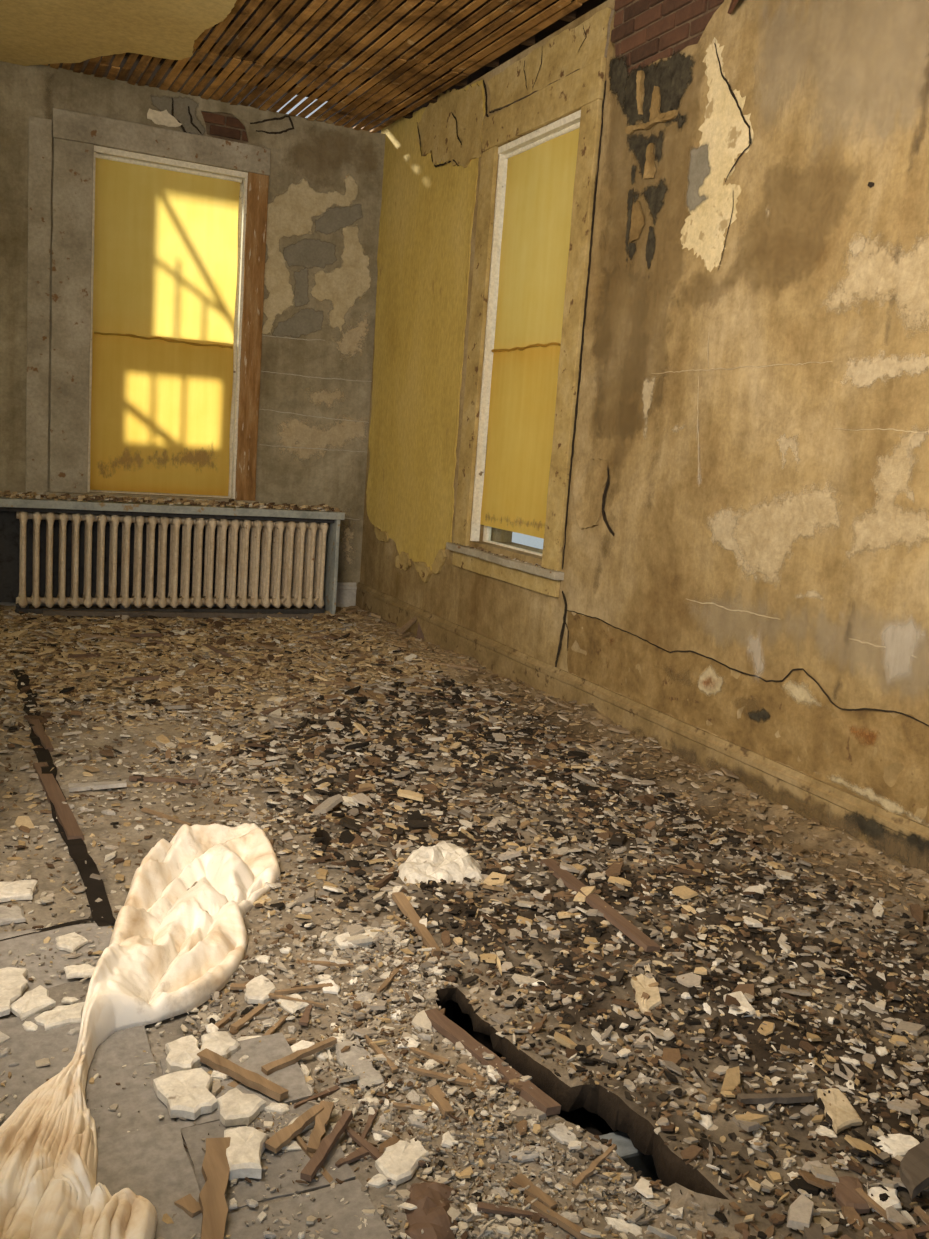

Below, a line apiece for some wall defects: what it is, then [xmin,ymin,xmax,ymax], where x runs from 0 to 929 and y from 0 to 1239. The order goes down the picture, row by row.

spalling [147,96,294,143]
peeling [608,0,754,278]
peeling [262,80,486,582]
crack [483,7,615,667]
peeling [642,378,655,435]
crack [653,335,832,475]
peeling [708,427,929,585]
crack [687,599,780,620]